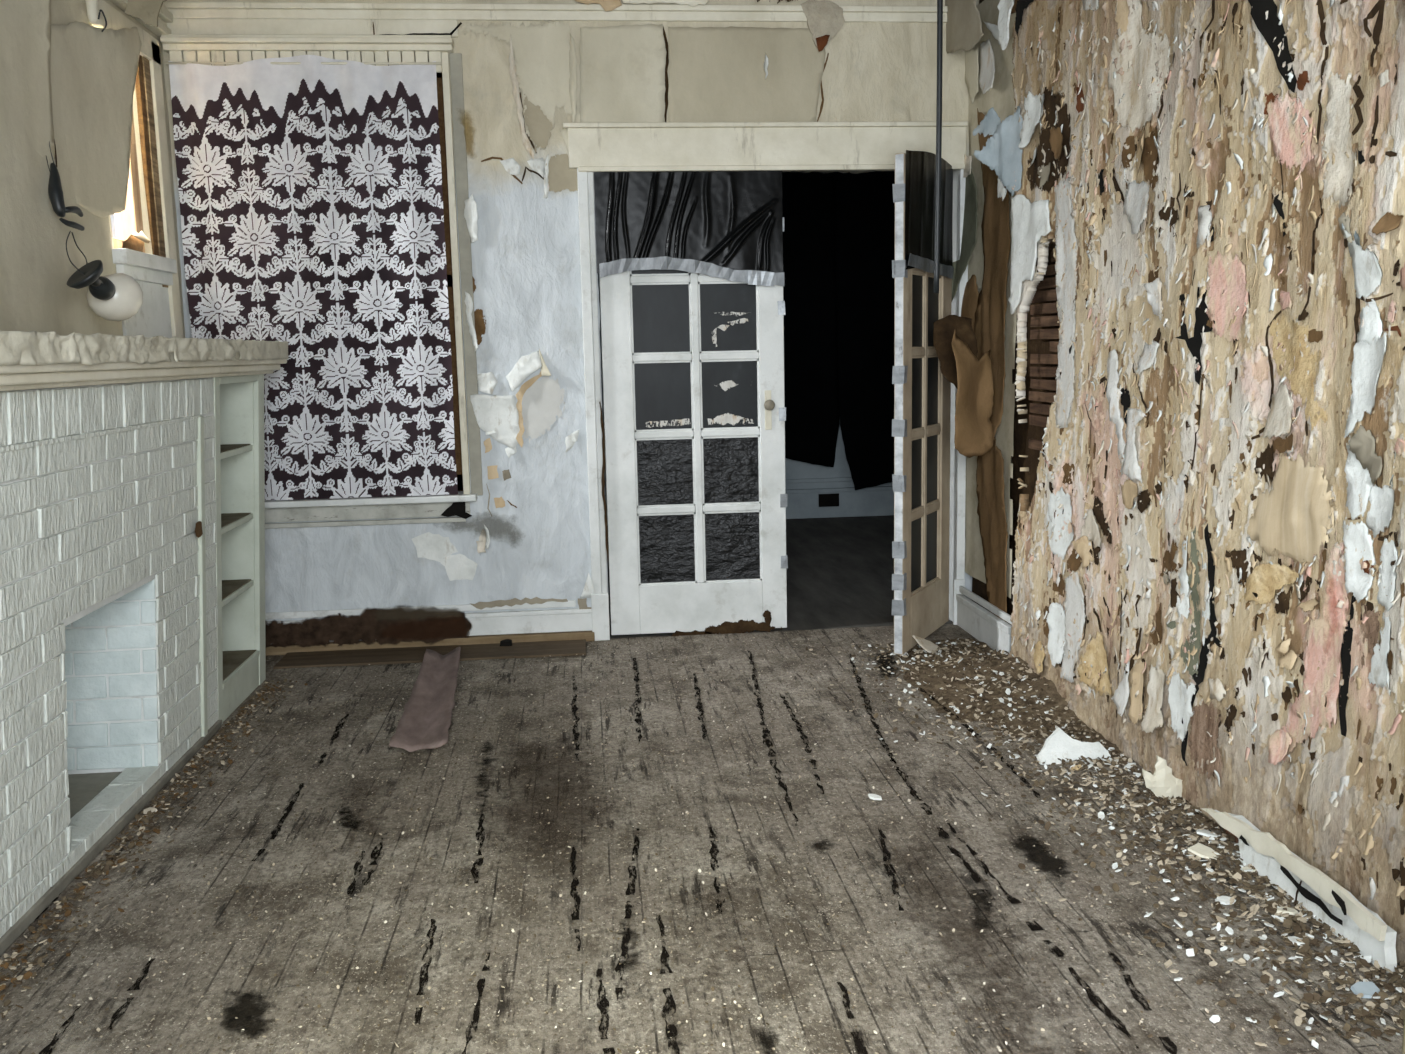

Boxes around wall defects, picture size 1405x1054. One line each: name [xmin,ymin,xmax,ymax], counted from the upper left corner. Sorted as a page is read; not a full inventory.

peeling [0,0,142,218]
peeling [463,0,845,160]
crack [662,27,670,122]
crack [817,53,829,122]
spalling [465,277,486,352]
peeling [441,349,565,553]
peeling [599,402,609,561]
peeling [933,0,1405,794]
damp [265,605,472,648]
peeling [672,610,782,636]
spalling [1188,829,1218,860]
peeling [1358,763,1405,915]